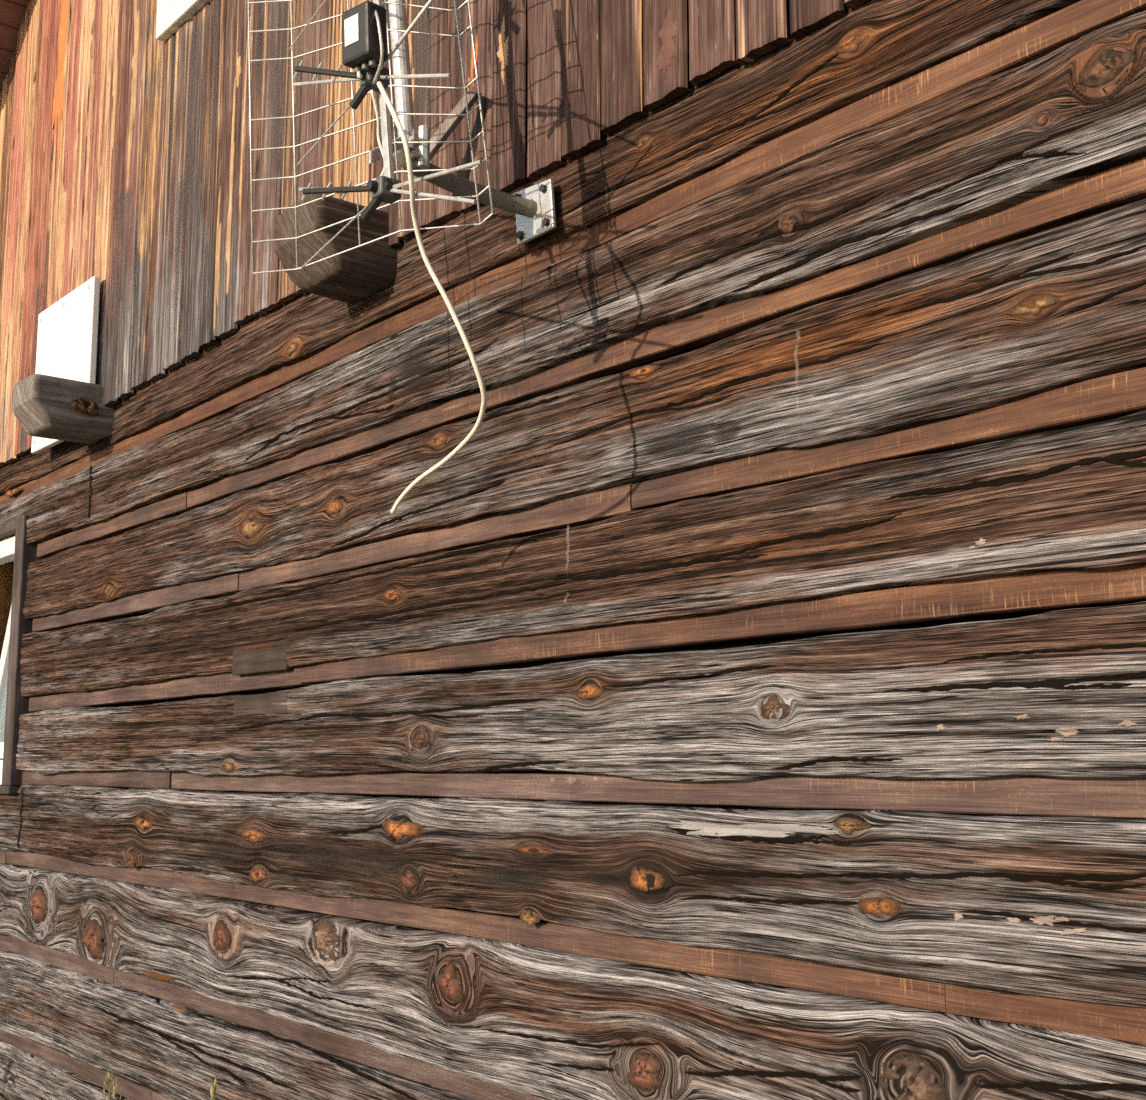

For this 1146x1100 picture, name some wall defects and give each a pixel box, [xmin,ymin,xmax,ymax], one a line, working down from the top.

crack [665,826,851,846]
crack [674,871,1146,905]